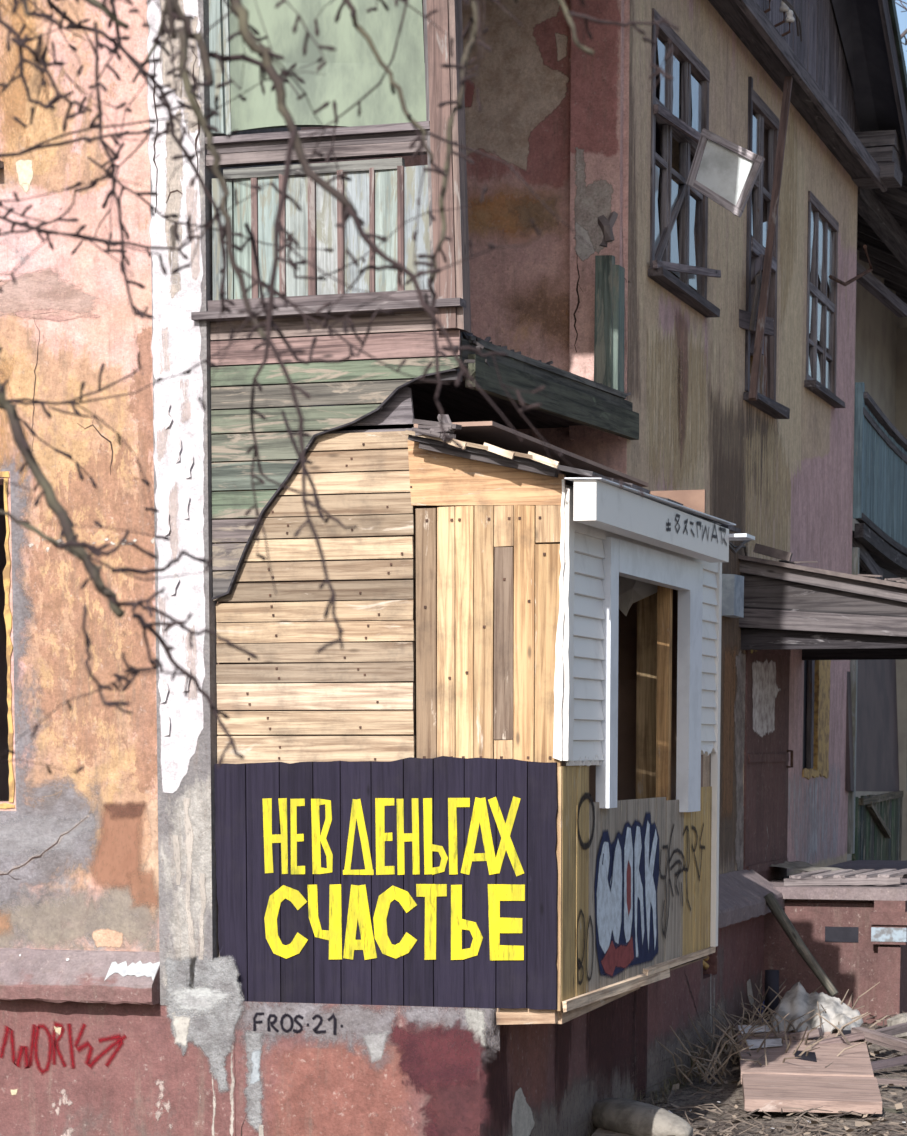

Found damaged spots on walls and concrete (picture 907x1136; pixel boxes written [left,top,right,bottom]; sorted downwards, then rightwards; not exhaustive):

peeling [462,0,569,171]
peeling [573,147,614,261]
peeling [145,0,206,913]
crack [0,817,87,879]
peeling [92,928,123,948]